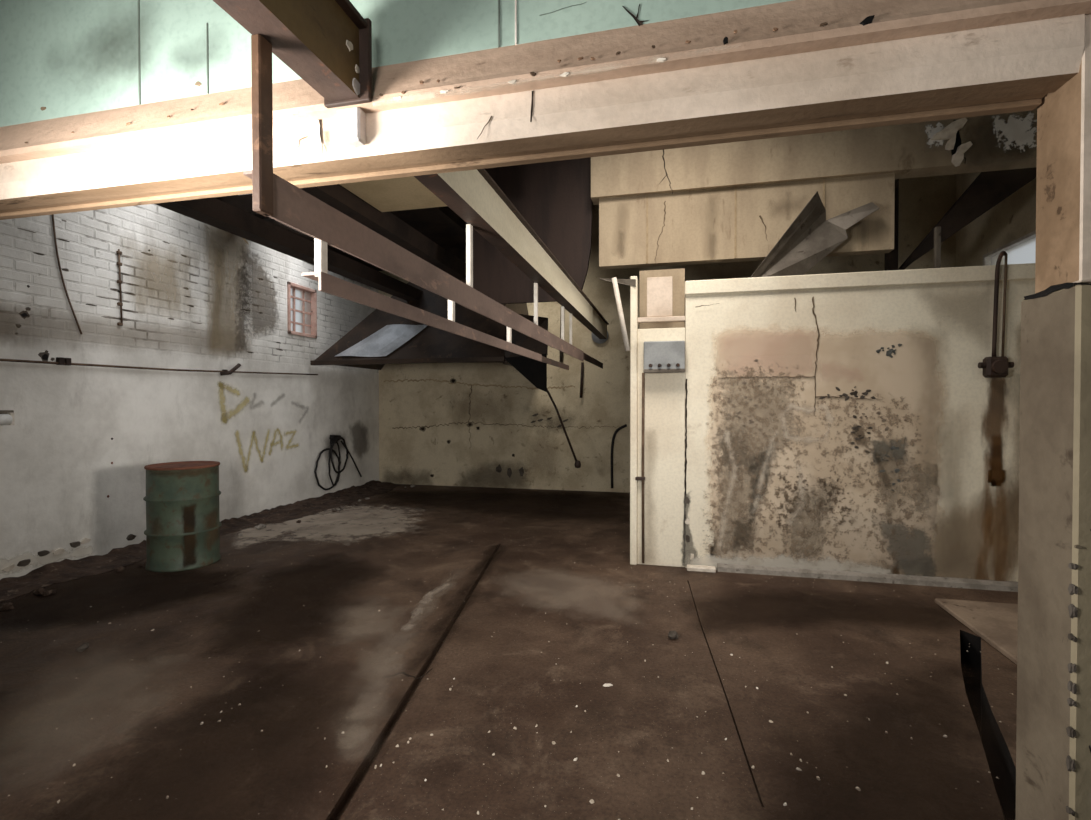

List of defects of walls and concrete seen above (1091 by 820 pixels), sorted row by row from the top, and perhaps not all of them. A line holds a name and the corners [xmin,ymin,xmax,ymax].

peeling [992,113,1037,152]
damp [209,229,276,350]
crack [725,297,881,413]
rust [983,378,1006,487]
damp [690,556,906,574]
damp [926,490,1019,579]